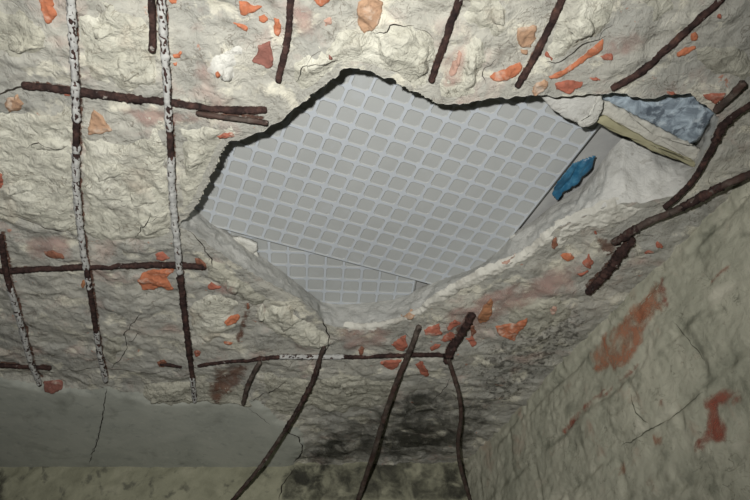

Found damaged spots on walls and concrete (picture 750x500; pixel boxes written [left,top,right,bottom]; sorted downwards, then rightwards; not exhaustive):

spalling [515,0,614,97]
peeling [540,0,725,128]
spalling [179,46,750,338]
spalling [0,0,510,500]
peeling [595,287,666,370]
crack [89,391,107,462]
rust [211,365,246,403]
leakage [290,470,309,491]
leakage [315,392,484,499]